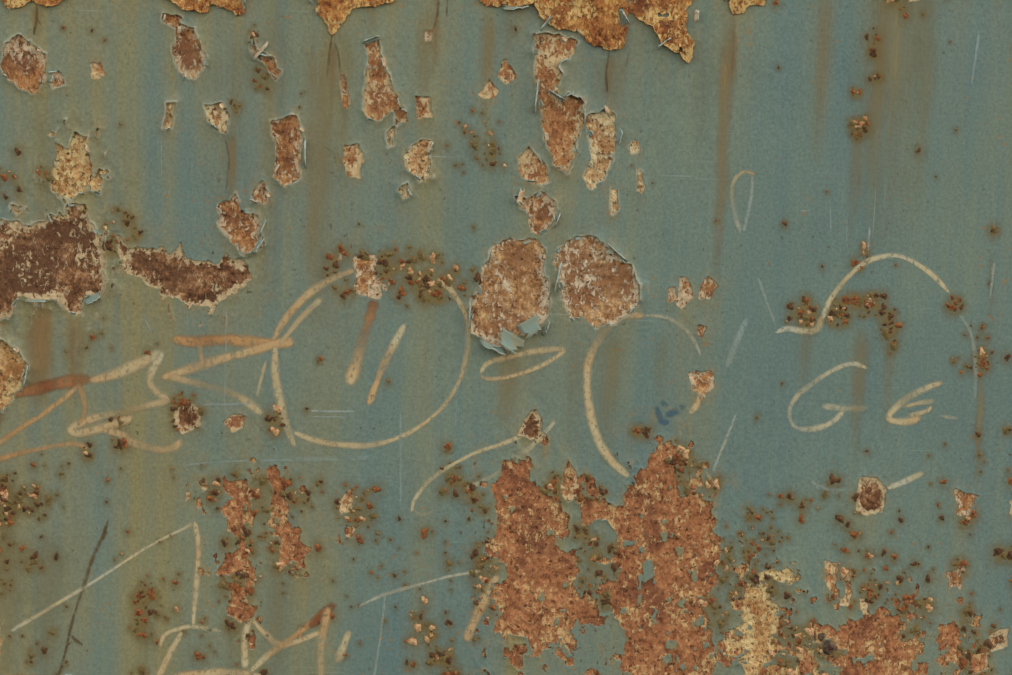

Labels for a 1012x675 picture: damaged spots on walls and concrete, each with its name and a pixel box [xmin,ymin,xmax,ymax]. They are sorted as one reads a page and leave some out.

peeling [0,129,113,319]
peeling [468,32,640,355]
rust [786,292,903,354]
peeling [0,331,29,411]
rust [515,410,548,446]
rust [439,426,1009,675]
rust [993,545,1012,562]
rust [404,588,470,675]
peeling [719,551,803,675]